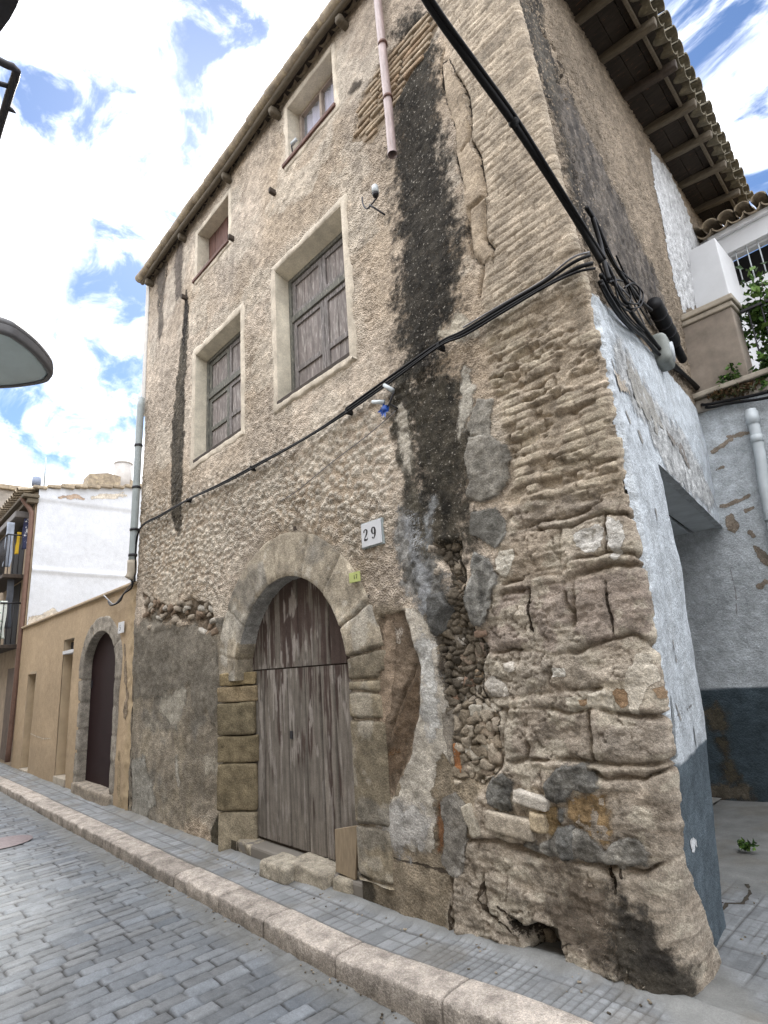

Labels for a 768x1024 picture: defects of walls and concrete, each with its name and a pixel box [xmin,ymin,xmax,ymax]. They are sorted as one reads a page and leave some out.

flaking render [349,12,438,145]
leakage [157,240,189,536]
leakage [376,7,480,857]
peeling [611,335,768,566]
flaking render [142,592,219,636]
flaking render [428,542,504,786]
crack [526,589,534,632]
crack [605,583,614,633]
spalling [507,915,560,947]
leakage [544,859,700,997]